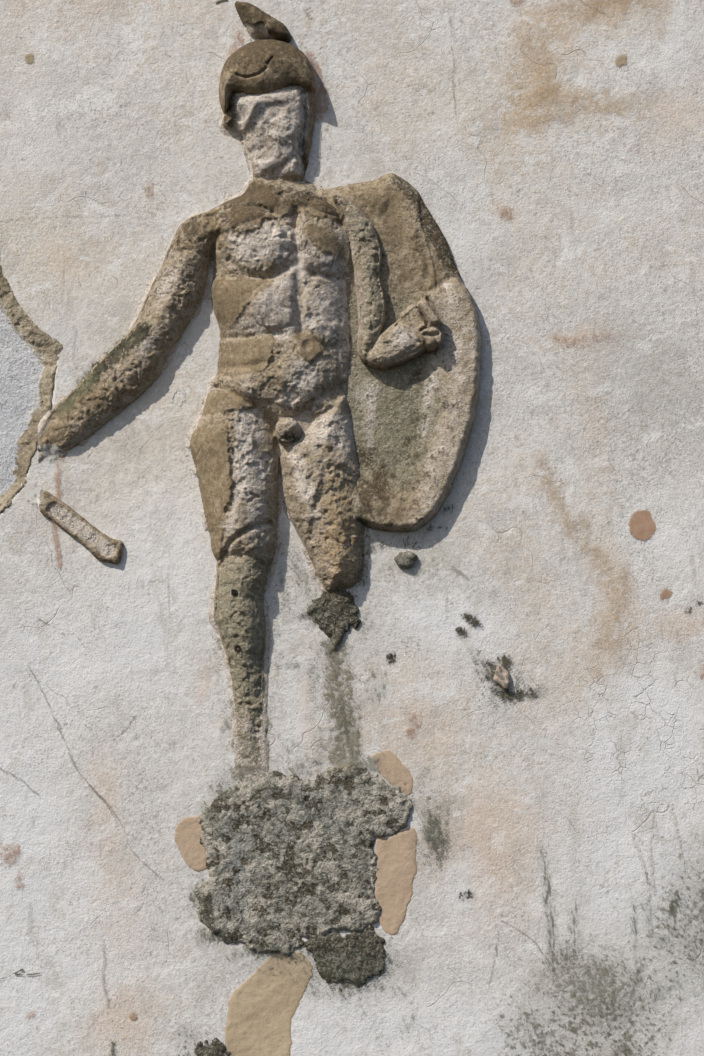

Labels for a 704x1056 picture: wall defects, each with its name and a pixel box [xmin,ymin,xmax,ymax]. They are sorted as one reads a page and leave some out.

peeling [24,481,42,506]
leakage [495,802,704,1056]